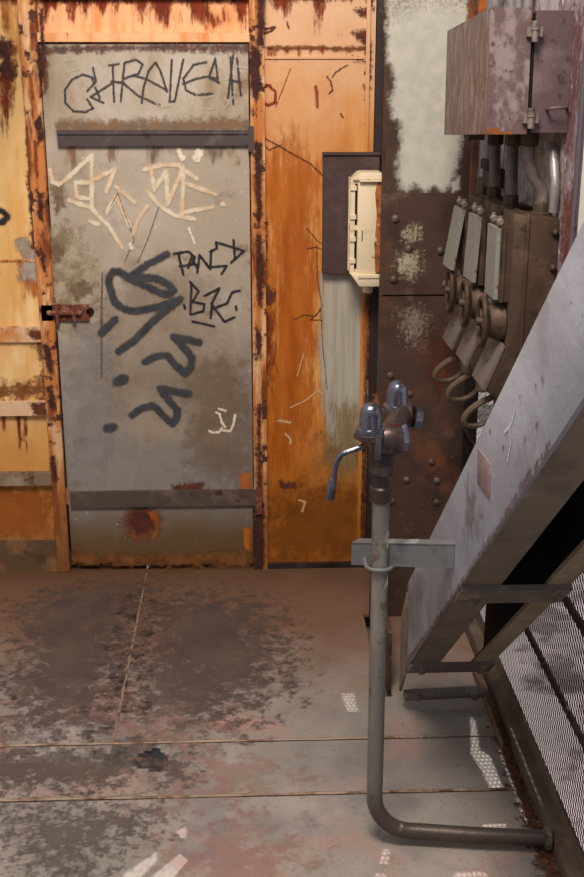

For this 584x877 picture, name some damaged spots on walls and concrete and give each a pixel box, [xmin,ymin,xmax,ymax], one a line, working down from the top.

corrosion [0,0,18,130]
corrosion [25,0,373,273]
peeling [385,0,469,193]
corrosion [240,141,323,489]
peeling [391,222,425,280]
corrosion [0,329,56,448]
corrosion [71,503,265,569]
corrosion [172,481,205,490]
water stain [0,580,312,877]